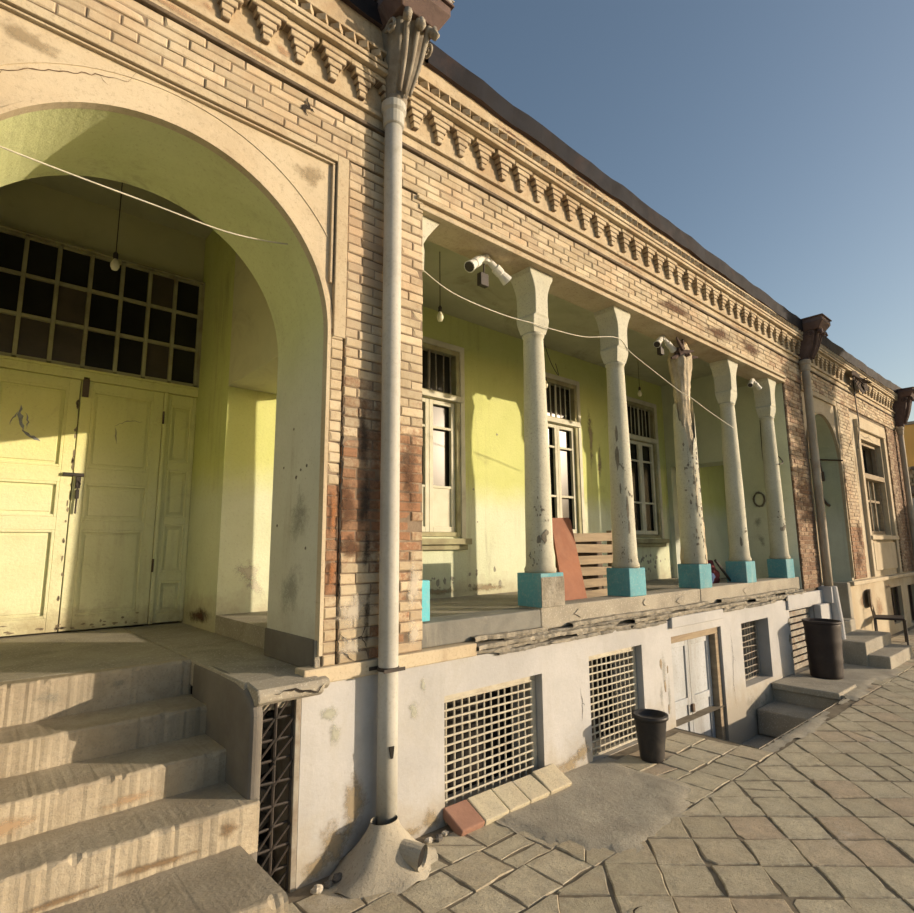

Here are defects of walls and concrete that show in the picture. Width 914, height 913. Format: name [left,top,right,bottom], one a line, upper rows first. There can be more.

crack [0,68,136,83]
peeling [10,406,40,441]
water stain [360,416,368,458]
water stain [404,447,416,496]
water stain [342,475,370,522]
peeling [682,443,706,559]
water stain [308,782,364,876]